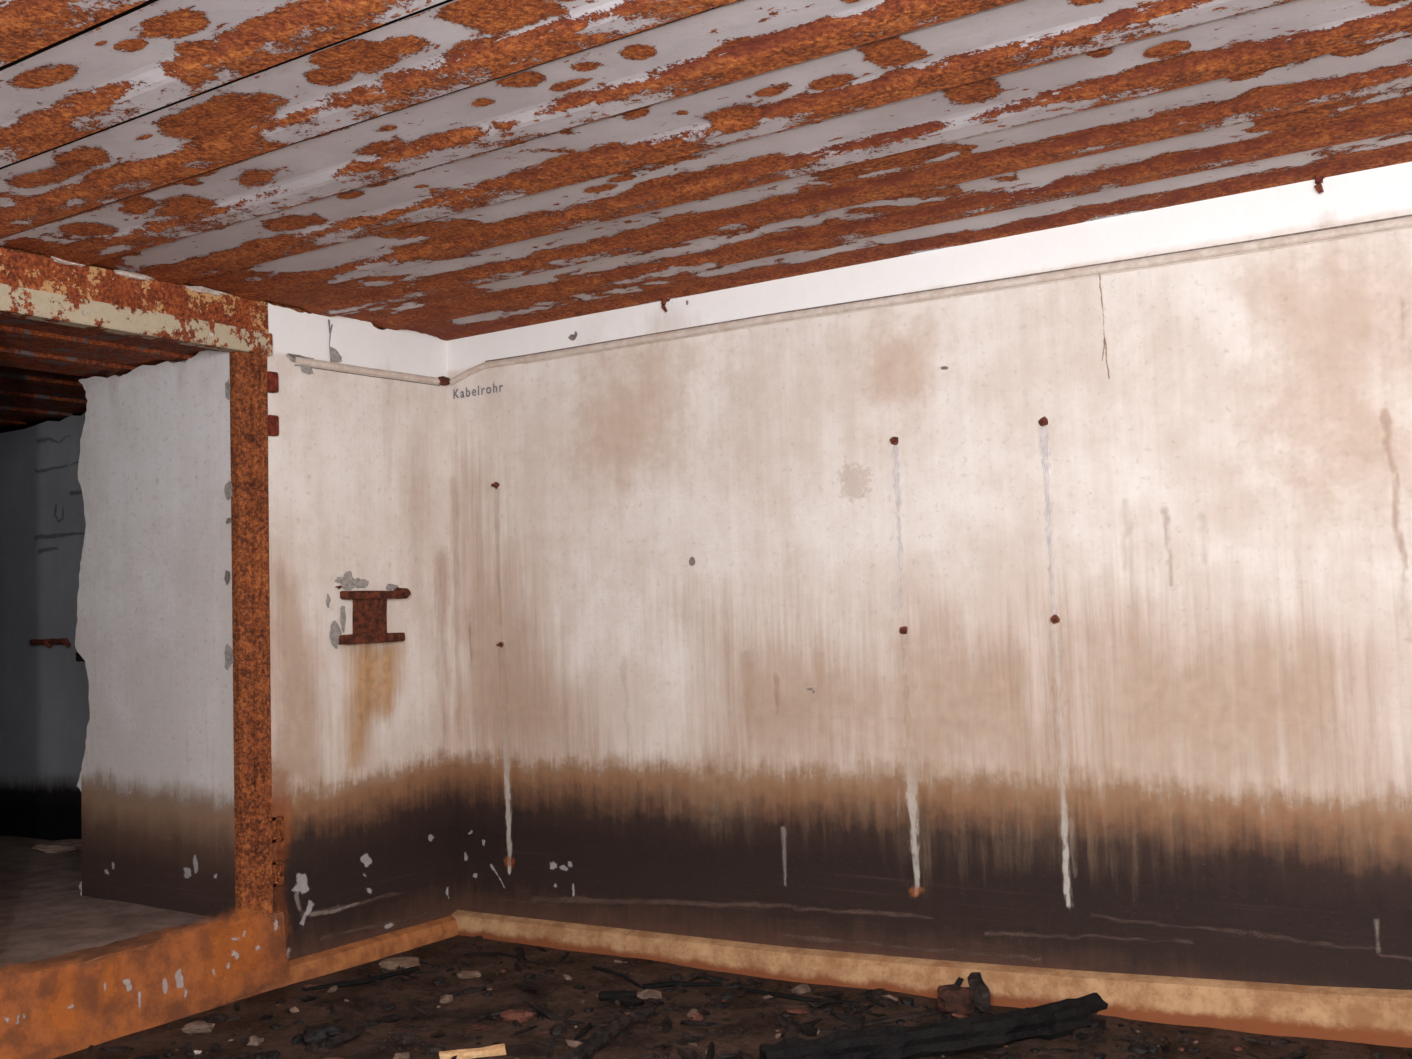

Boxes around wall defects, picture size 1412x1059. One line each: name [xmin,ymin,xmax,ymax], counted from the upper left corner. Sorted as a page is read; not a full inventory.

rust [0,0,1412,341]
peeling [51,256,86,267]
peeling [185,286,228,296]
leakage [0,779,235,918]
leakage [272,622,1412,990]
rust [0,909,290,1059]